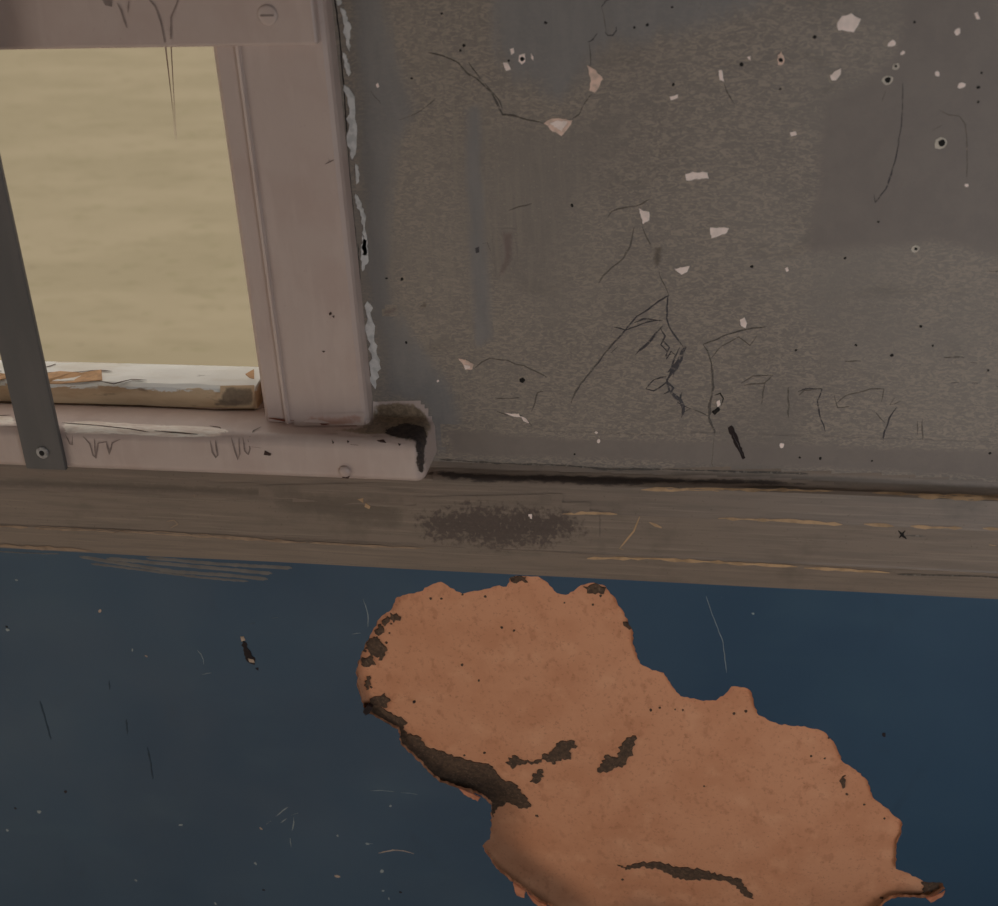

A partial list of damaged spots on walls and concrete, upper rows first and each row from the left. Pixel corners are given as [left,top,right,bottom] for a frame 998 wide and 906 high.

crack [428,52,541,123]
peeling [357,576,945,906]